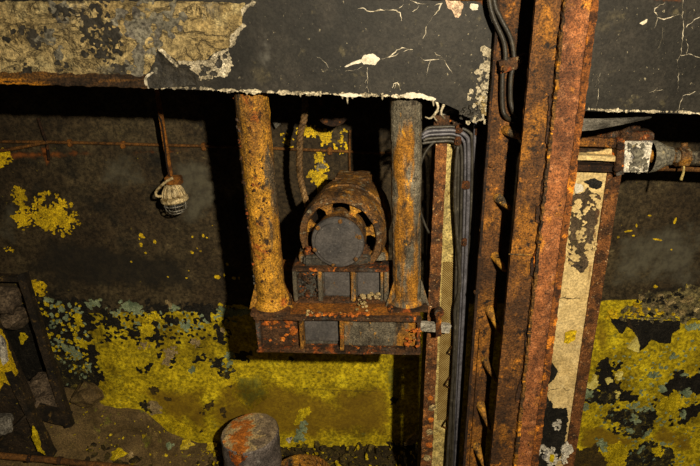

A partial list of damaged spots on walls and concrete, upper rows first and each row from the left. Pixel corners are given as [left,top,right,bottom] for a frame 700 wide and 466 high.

flaking render [0,0,256,89]
crack [347,1,451,92]
spalling [425,101,445,121]
spalling [458,45,492,125]
crack [654,4,700,112]
corrosion [241,171,269,232]
peeling [567,178,603,273]
water stain [212,384,387,435]
flaking render [538,283,700,466]